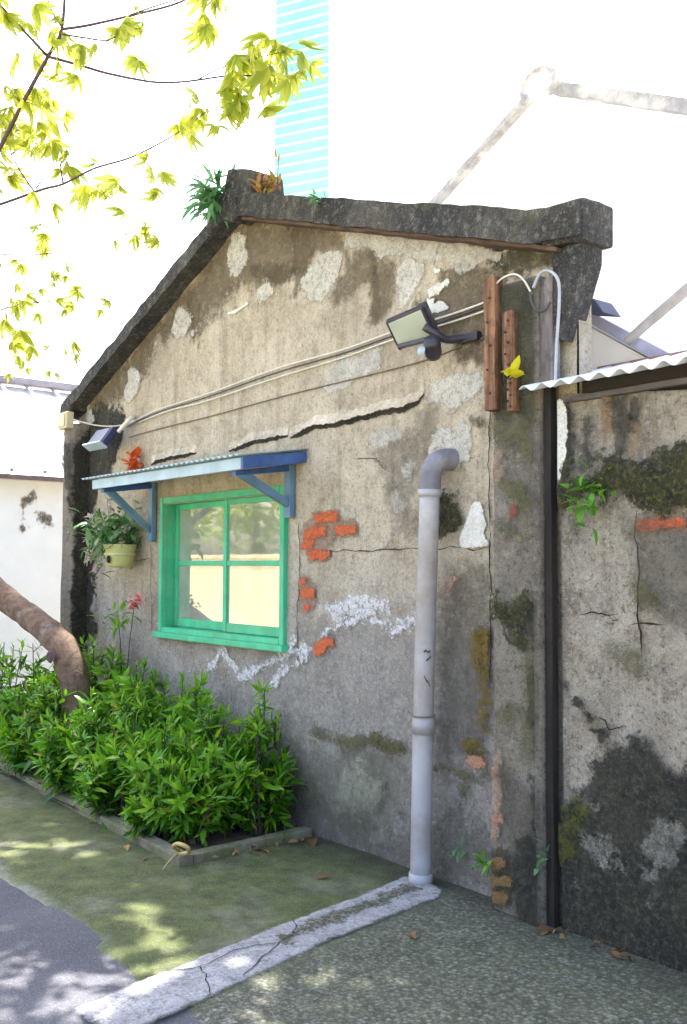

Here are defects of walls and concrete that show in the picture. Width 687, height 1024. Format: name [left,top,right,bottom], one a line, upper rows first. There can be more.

flaking render [171,306,197,339]
flaking render [227,230,249,278]
flaking render [300,247,342,303]
water stain [61,223,397,653]
spalling [229,393,424,452]
flaking render [300,508,357,563]
crack [325,413,492,681]
crack [582,510,662,653]
water stain [161,592,416,856]
water stain [431,601,537,927]
water stain [560,681,687,974]
crack [167,918,297,993]